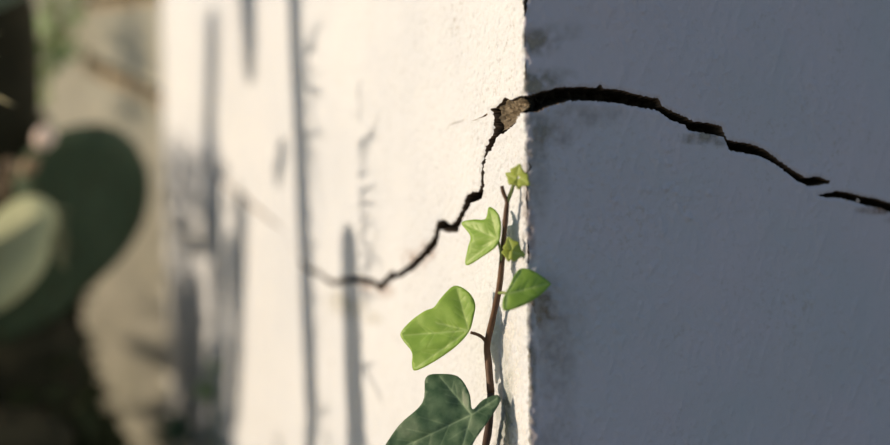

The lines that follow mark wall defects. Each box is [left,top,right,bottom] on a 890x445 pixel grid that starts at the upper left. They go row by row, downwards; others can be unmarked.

crack [286,0,890,292]